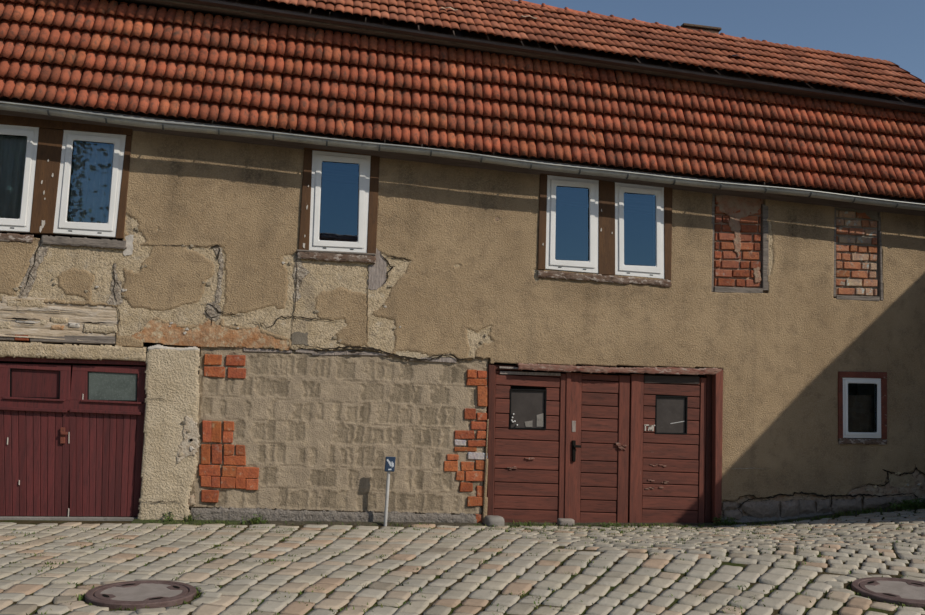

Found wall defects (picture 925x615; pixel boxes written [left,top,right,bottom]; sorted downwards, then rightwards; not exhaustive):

flaking render [147,344,246,379]
peeling [0,213,455,359]
crack [205,252,490,361]
peeling [466,326,493,359]
flaking render [176,416,259,506]
flaking render [444,370,487,523]
crack [724,465,925,515]